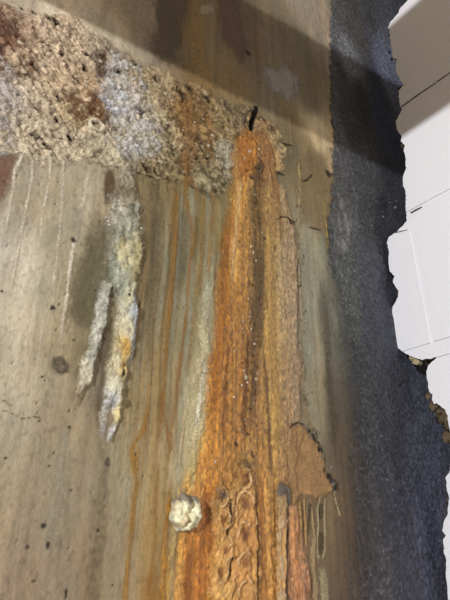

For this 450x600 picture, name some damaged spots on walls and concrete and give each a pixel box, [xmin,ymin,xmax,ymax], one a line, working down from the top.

water stain [70,51,161,440]
corrosion [123,409,148,600]
spalling [0,2,287,198]
corrosion [148,102,311,600]
peeling [296,163,338,491]